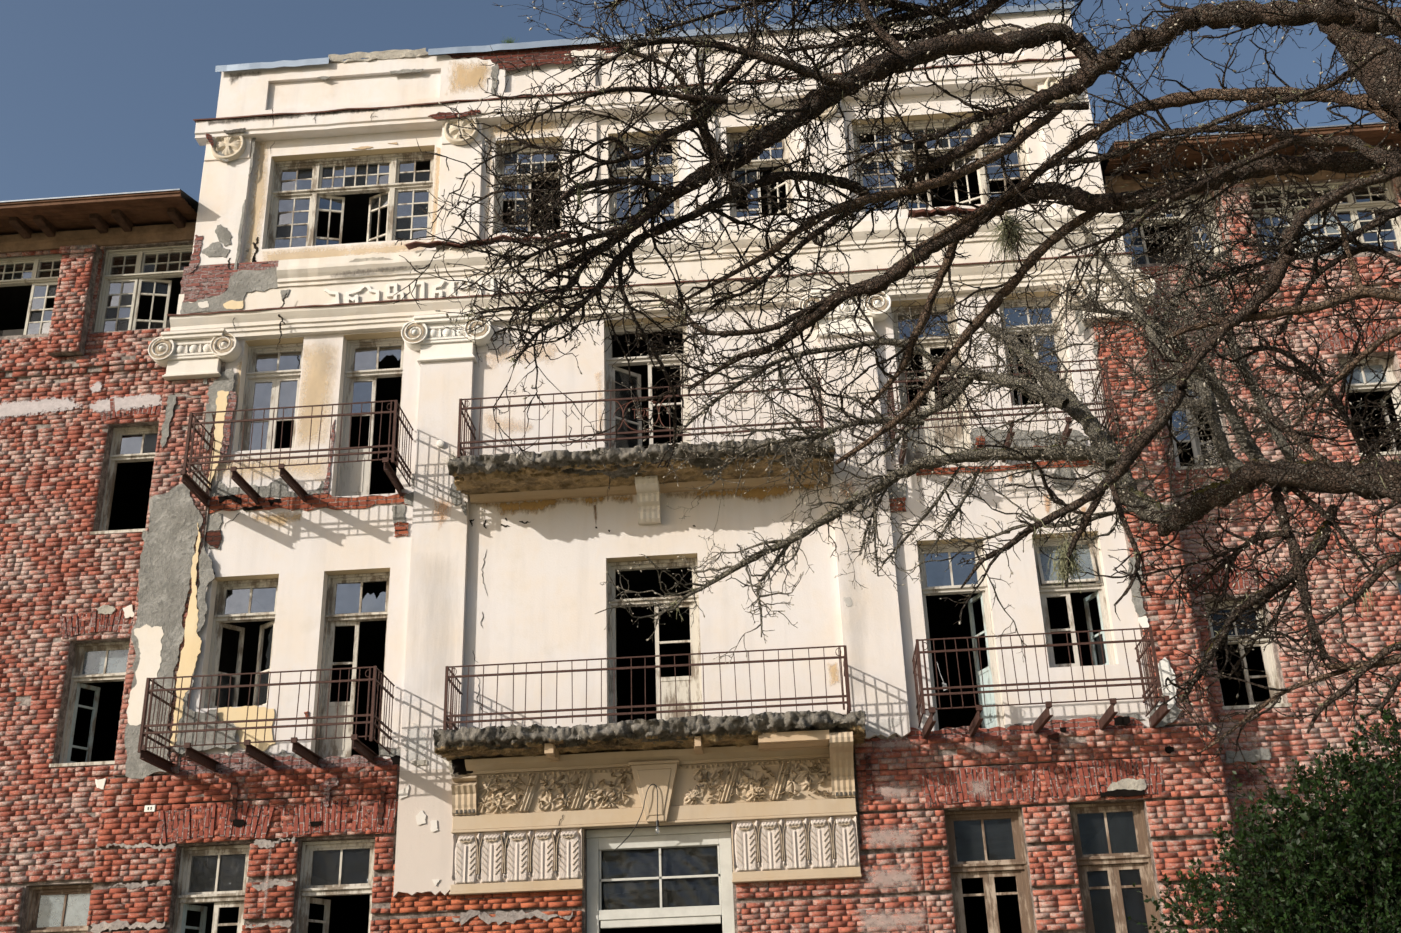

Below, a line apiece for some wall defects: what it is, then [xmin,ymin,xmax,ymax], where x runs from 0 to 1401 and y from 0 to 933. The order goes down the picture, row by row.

spalling [180,199,290,314]
spalling [450,483,467,515]